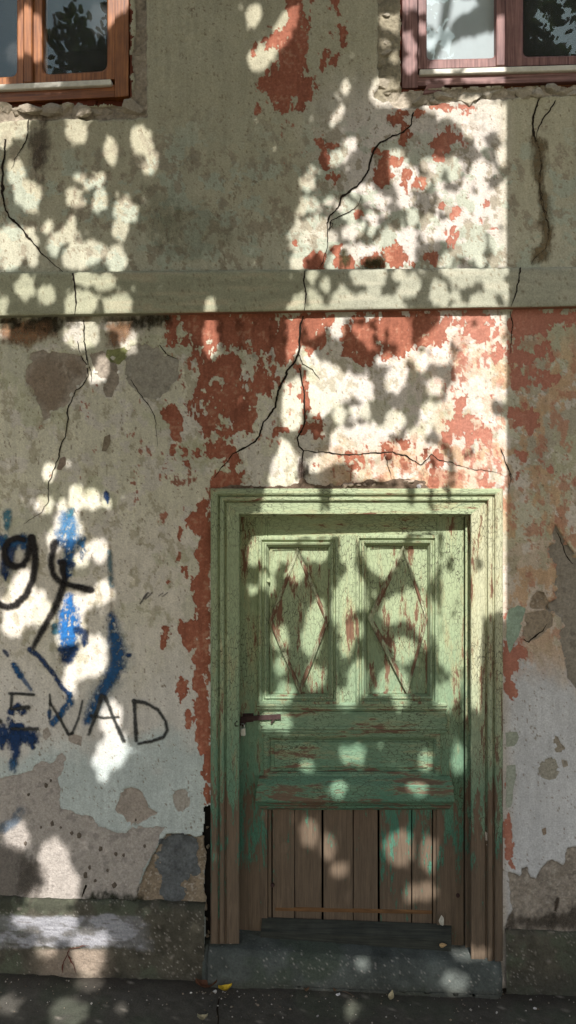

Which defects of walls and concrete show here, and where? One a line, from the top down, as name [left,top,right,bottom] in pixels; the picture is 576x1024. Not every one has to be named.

peeling [251,0,349,115]
crack [0,119,92,523]
peeling [25,309,576,489]
crack [215,112,514,487]
crack [510,99,556,353]
peeling [160,498,209,815]
peeling [505,521,576,701]
peeling [0,753,210,937]
spalling [505,765,576,931]